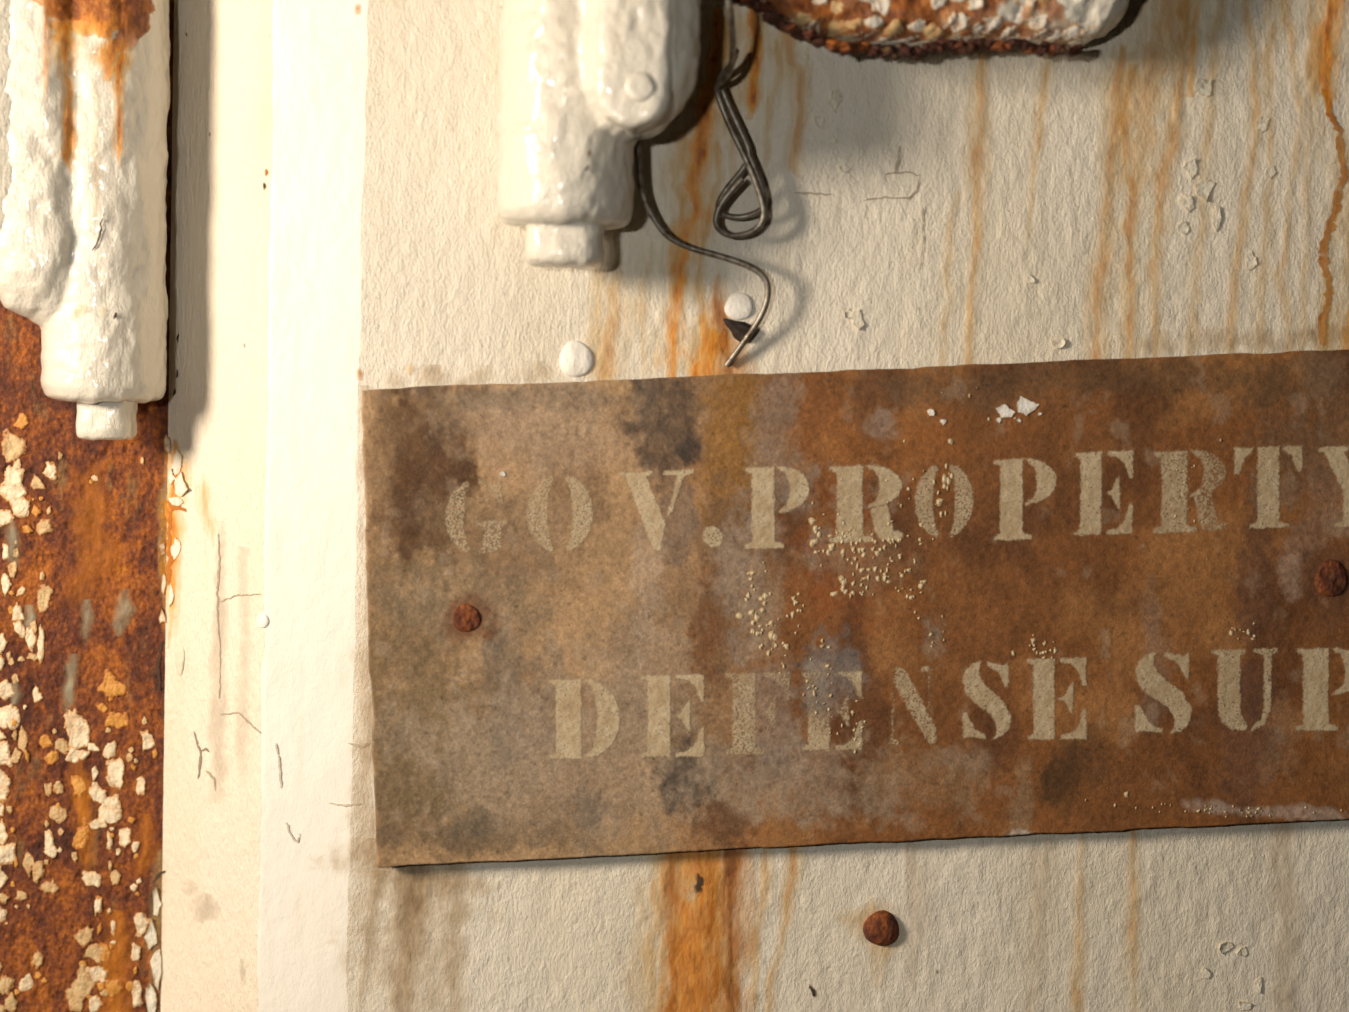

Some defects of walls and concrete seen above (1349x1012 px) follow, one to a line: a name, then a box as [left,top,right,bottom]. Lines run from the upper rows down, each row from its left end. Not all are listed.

rust [1319,0,1342,109]
peeling [164,435,189,506]
peeling [159,573,174,623]
peeling [158,538,181,559]
rust [165,446,182,609]
peeling [0,413,162,1012]
rust [74,773,92,862]
rust [102,910,127,1012]
damp [397,864,431,954]
rust [665,848,744,1012]